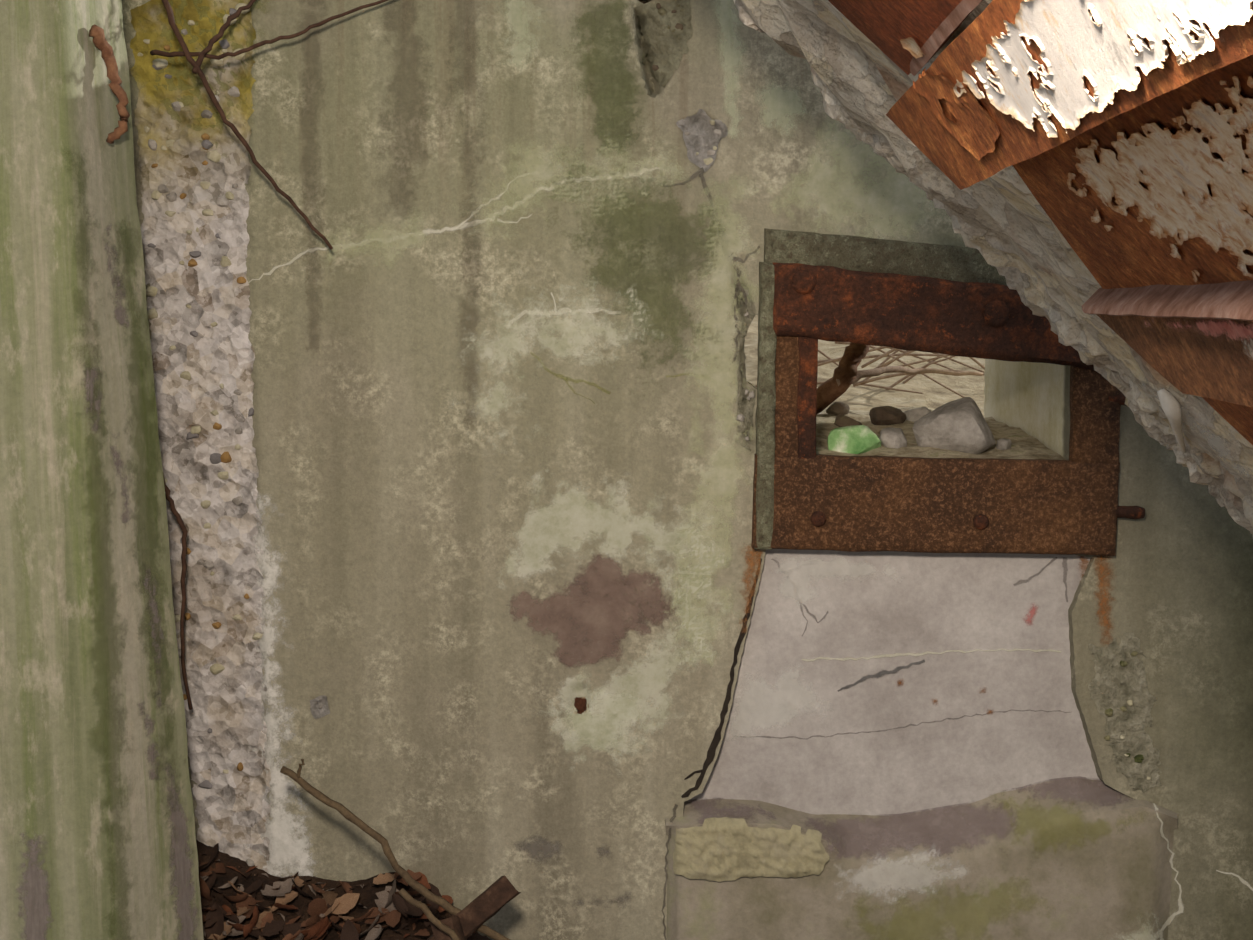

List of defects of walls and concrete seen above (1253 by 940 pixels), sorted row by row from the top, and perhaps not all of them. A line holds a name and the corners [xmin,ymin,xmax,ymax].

peeling [900,0,1253,160]
peeling [1067,76,1253,278]
spalling [130,0,272,872]
corrosion [744,547,762,629]
corrosion [1080,555,1111,643]
leakage [18,838,51,940]
leakage [139,704,197,940]
crack [662,557,1069,940]